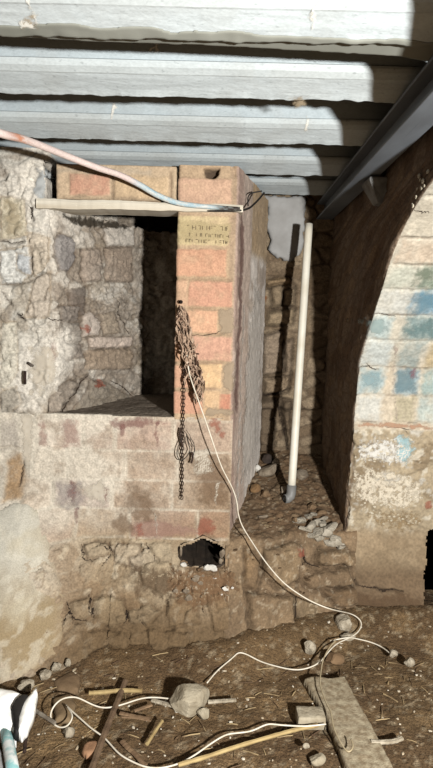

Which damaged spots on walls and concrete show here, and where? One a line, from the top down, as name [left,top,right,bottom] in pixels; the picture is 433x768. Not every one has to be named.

spalling [167,535,240,612]
crack [354,579,404,592]
crack [63,594,95,625]